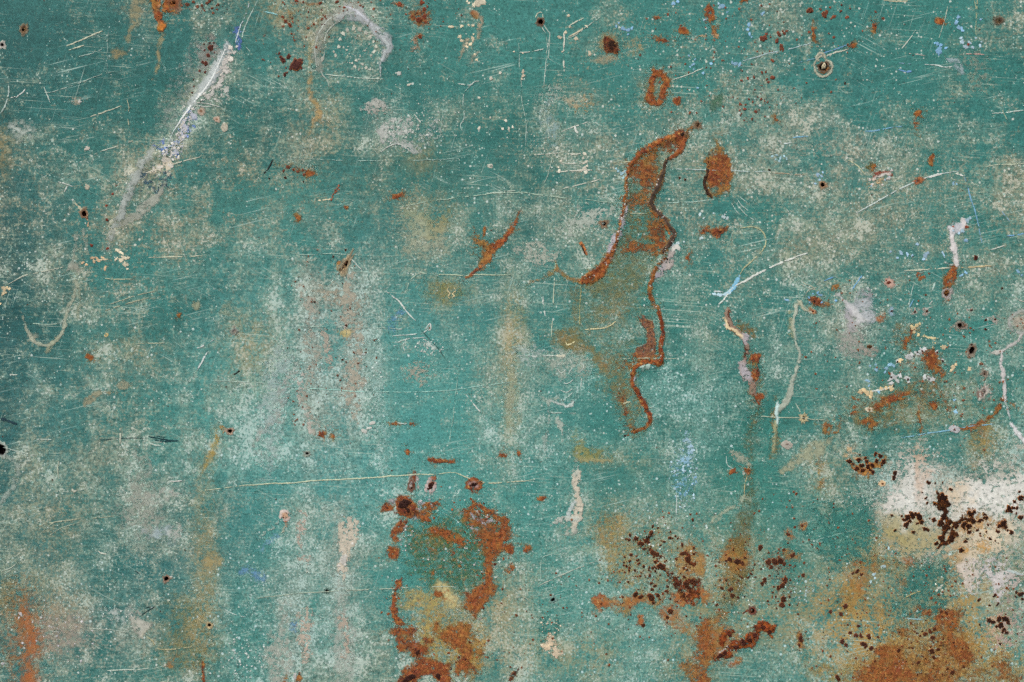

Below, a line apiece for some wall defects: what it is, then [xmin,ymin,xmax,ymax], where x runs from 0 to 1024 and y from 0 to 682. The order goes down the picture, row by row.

rust [641,0,884,122]
rust [703,139,734,198]
rust [465,211,520,278]
rust [554,129,691,436]
rust [833,295,1017,446]
rust [844,444,887,479]
rust [378,480,1024,682]